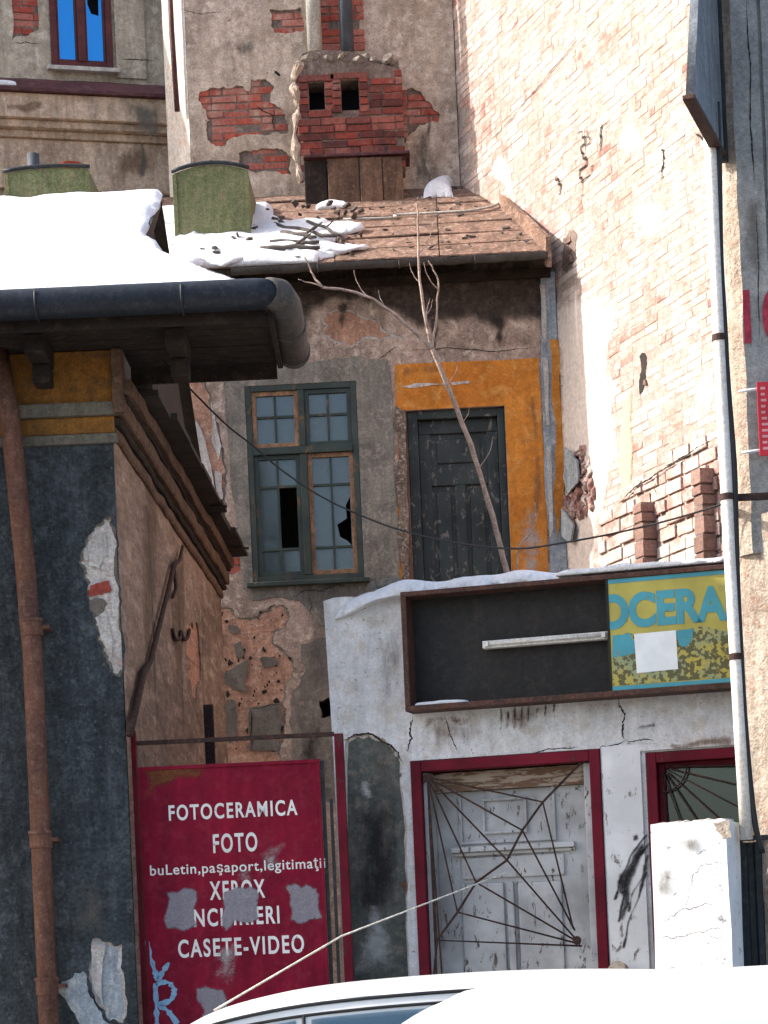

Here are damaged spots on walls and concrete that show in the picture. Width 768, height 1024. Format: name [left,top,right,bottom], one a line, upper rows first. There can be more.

spalling [12,0,39,40]
spalling [198,60,304,184]
spalling [402,89,440,144]
crack [555,119,610,199]
spalling [321,309,404,347]
flaking render [540,285,648,569]
spalling [79,515,126,677]
spalling [221,604,296,763]
crack [535,699,654,753]
efflorescence [363,913,390,961]
crack [656,862,730,939]
spalling [59,938,128,1024]